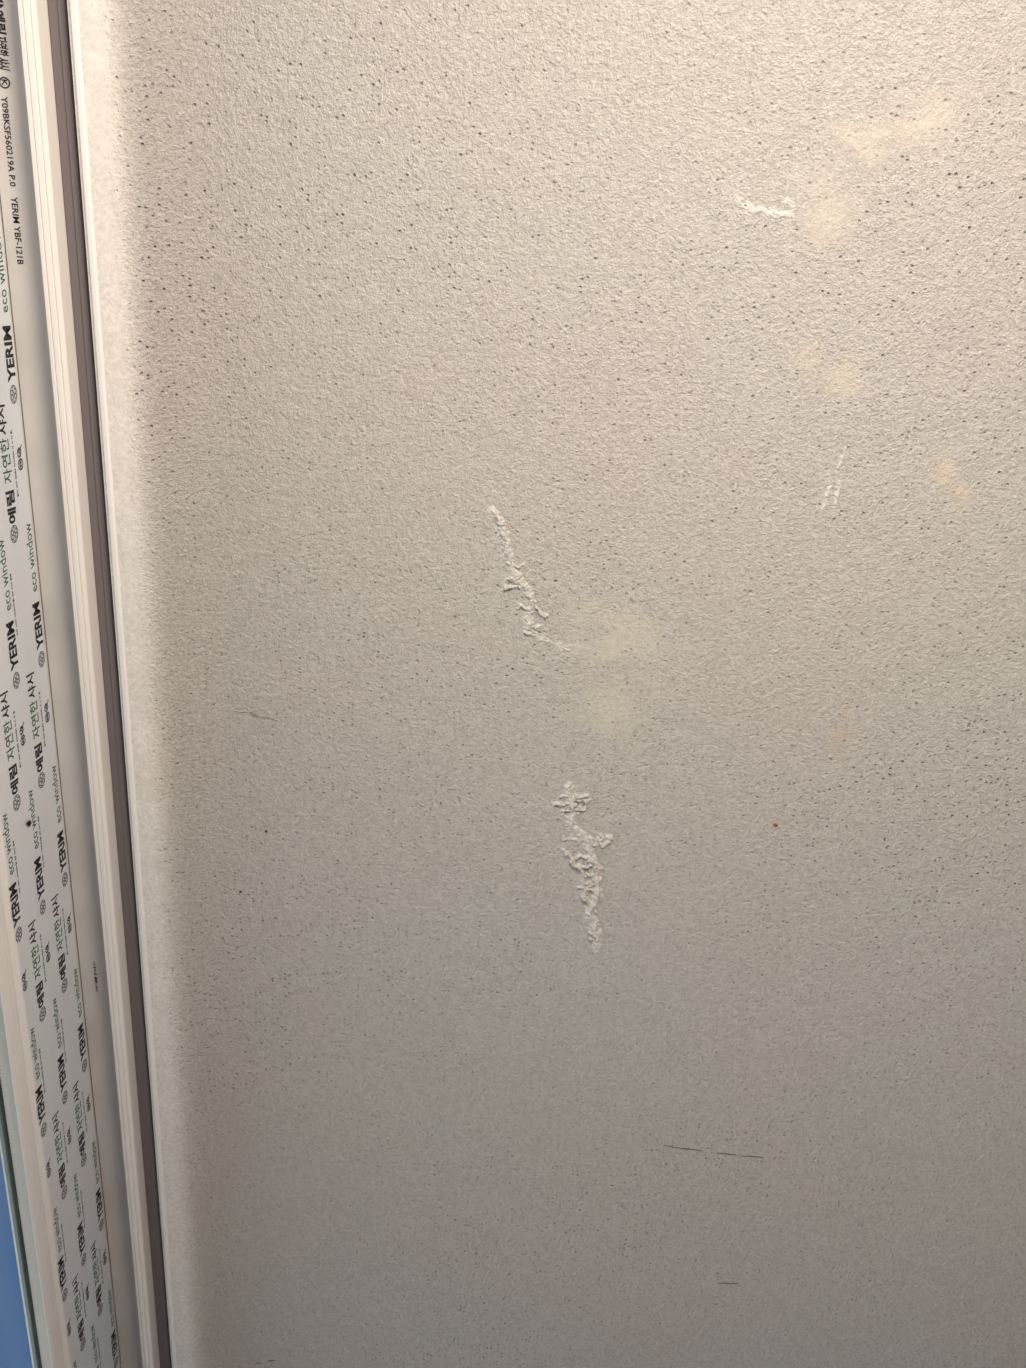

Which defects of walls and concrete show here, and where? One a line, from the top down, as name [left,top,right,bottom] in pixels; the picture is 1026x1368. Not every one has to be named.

crack [487,506,591,655]
crack [551,779,614,954]